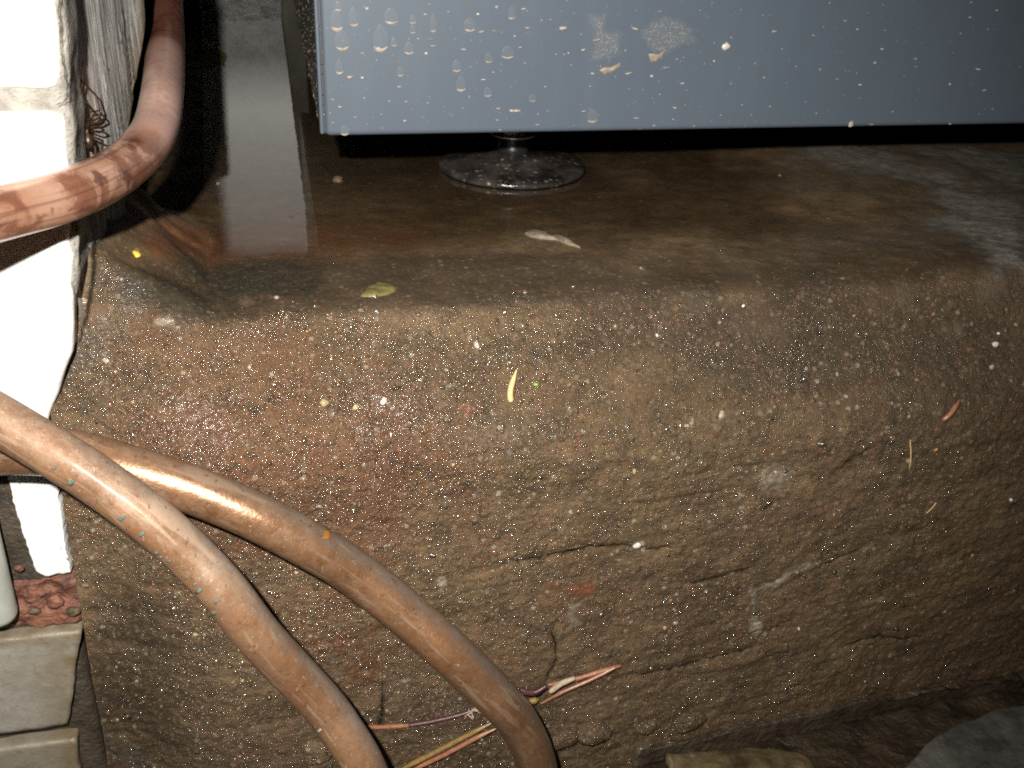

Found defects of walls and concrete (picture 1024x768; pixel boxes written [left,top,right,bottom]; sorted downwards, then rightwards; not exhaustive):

leakage [801,141,1024,271]
crack [518,543,669,563]
crack [685,567,749,583]